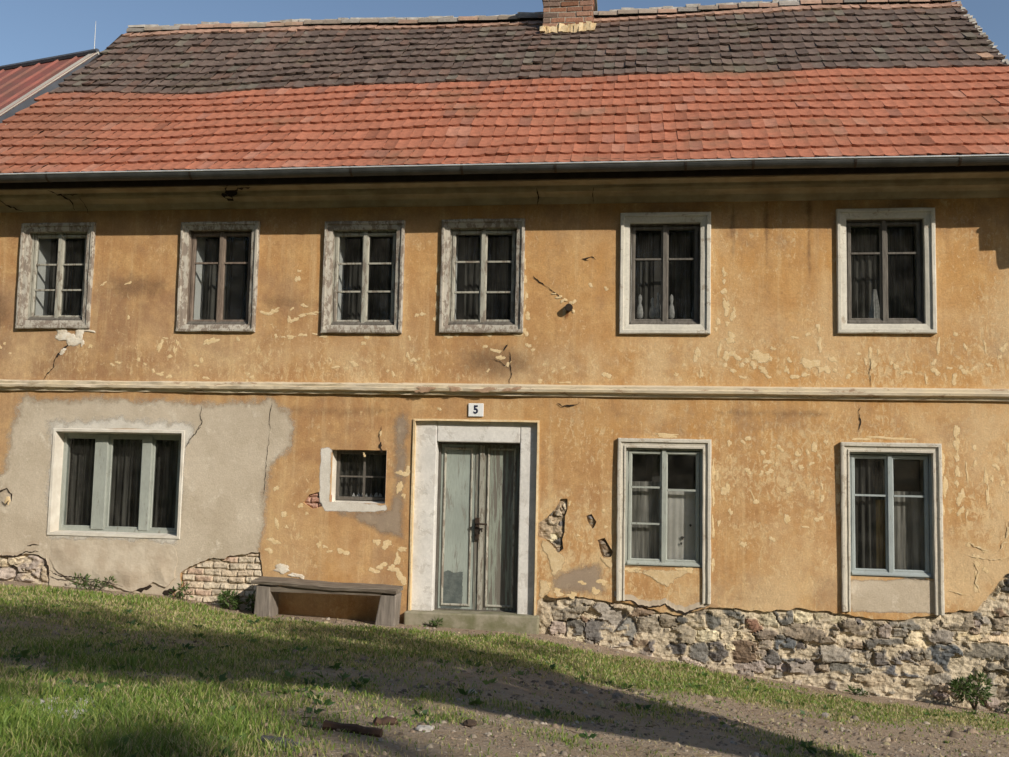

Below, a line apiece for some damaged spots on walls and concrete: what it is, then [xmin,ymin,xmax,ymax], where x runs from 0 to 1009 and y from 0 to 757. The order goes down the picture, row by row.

flaking render [55,328,95,355]
flaking render [298,492,332,515]
flaking render [0,554,49,585]
crack [2,541,122,587]
flaking render [174,511,304,611]
flaking render [538,499,613,601]
peeling [625,567,694,587]